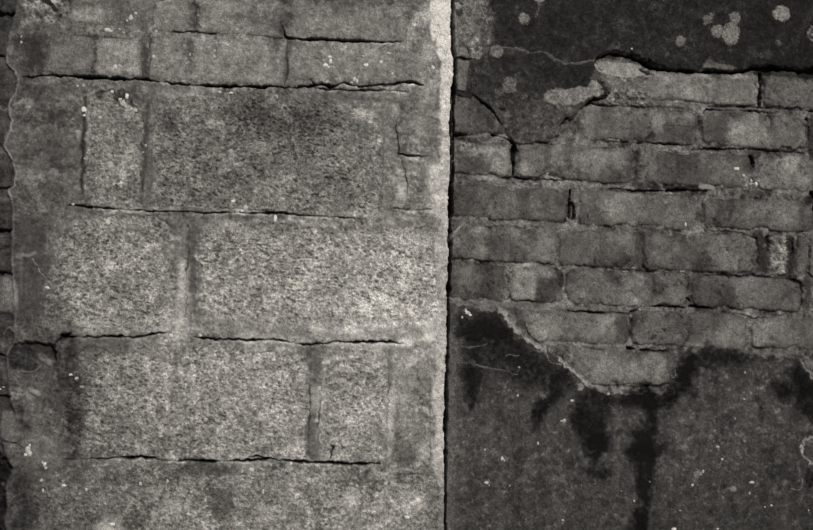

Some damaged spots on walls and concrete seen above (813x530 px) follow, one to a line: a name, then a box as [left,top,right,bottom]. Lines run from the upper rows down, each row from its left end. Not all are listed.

crack [456,90,516,145]
spalling [449,52,813,395]
water stain [570,343,742,530]
water stain [774,361,813,421]